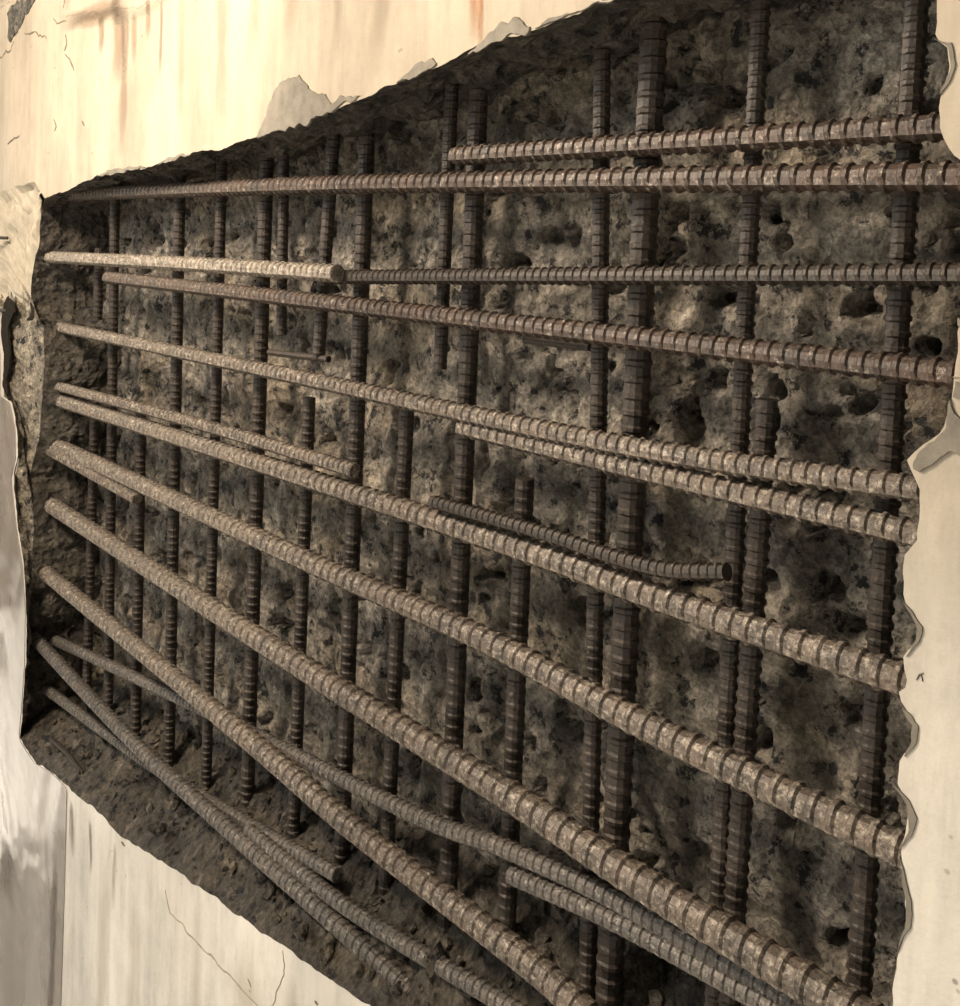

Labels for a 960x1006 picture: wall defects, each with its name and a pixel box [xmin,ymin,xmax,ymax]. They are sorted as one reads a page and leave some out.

crack [0,0,74,70]
spalling [757,191,893,266]
spalling [319,262,960,360]
spalling [748,364,882,470]
spalling [428,421,923,689]
spalling [635,607,722,740]
spalling [715,634,763,762]
spalling [755,651,865,809]
spalling [855,684,890,818]
crack [165,890,285,1006]
spalling [745,798,855,984]
spalling [845,848,880,999]